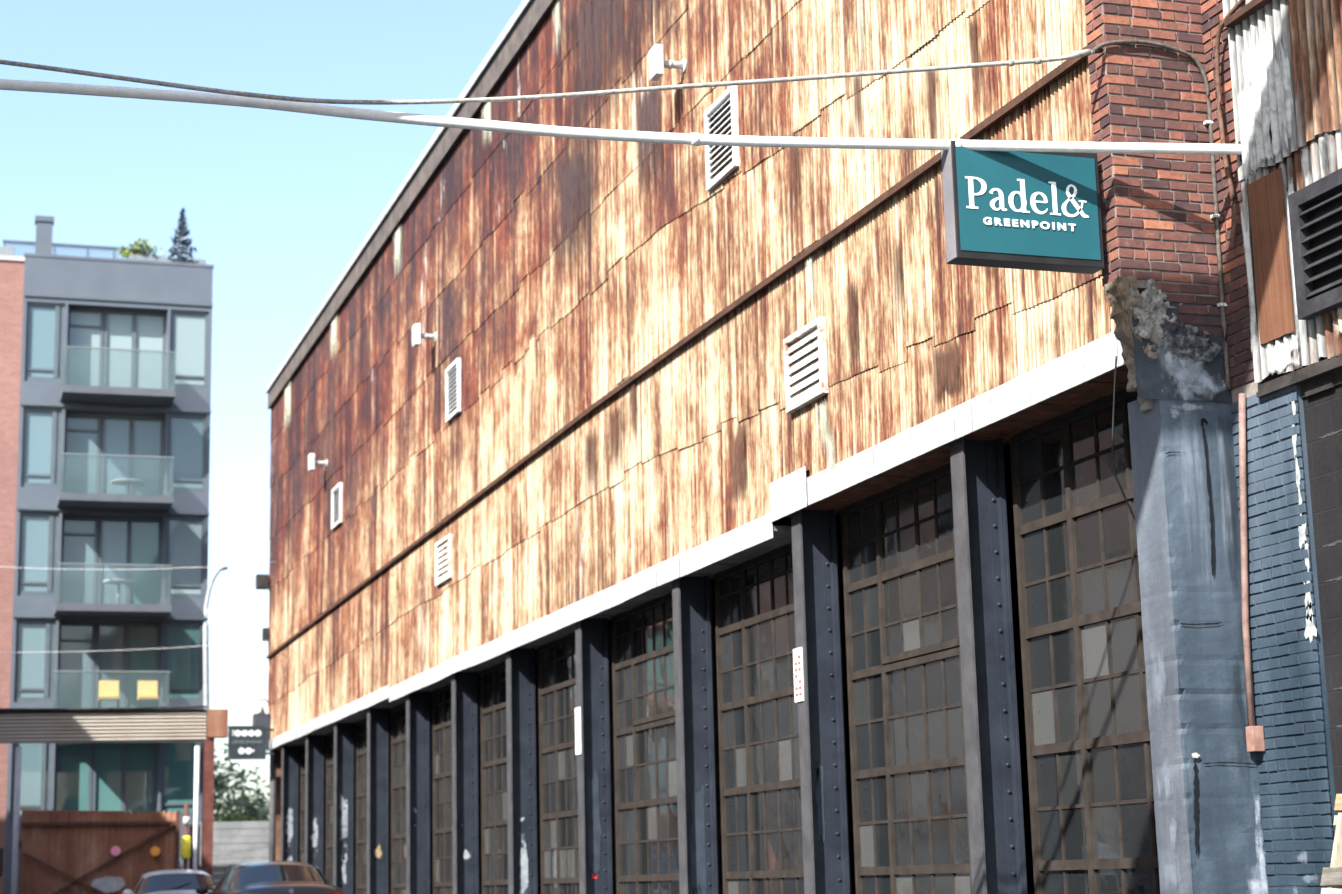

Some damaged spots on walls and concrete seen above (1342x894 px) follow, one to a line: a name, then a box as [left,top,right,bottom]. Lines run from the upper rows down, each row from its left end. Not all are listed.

rust [556,0,672,270]
rust [925,64,935,138]
rust [969,18,981,92]
rust [847,287,858,361]
spalling [1104,276,1223,412]
peeling [1334,308,1342,332]
rust [585,384,635,485]
rust [732,423,745,498]
peeling [1171,403,1197,418]
crack [1165,418,1215,576]
peeling [1292,401,1317,643]
crack [1191,753,1258,855]